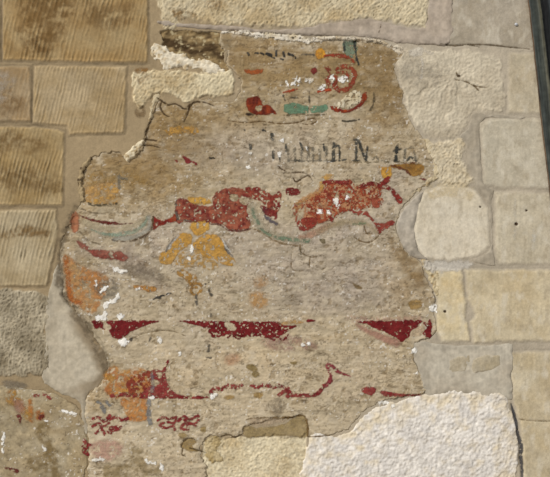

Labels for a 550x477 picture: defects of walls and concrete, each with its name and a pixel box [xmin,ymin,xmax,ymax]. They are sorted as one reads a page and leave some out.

crack [144,98,211,147]
flaking render [178,433,197,451]
flaking render [243,414,309,438]
crack [511,404,540,477]